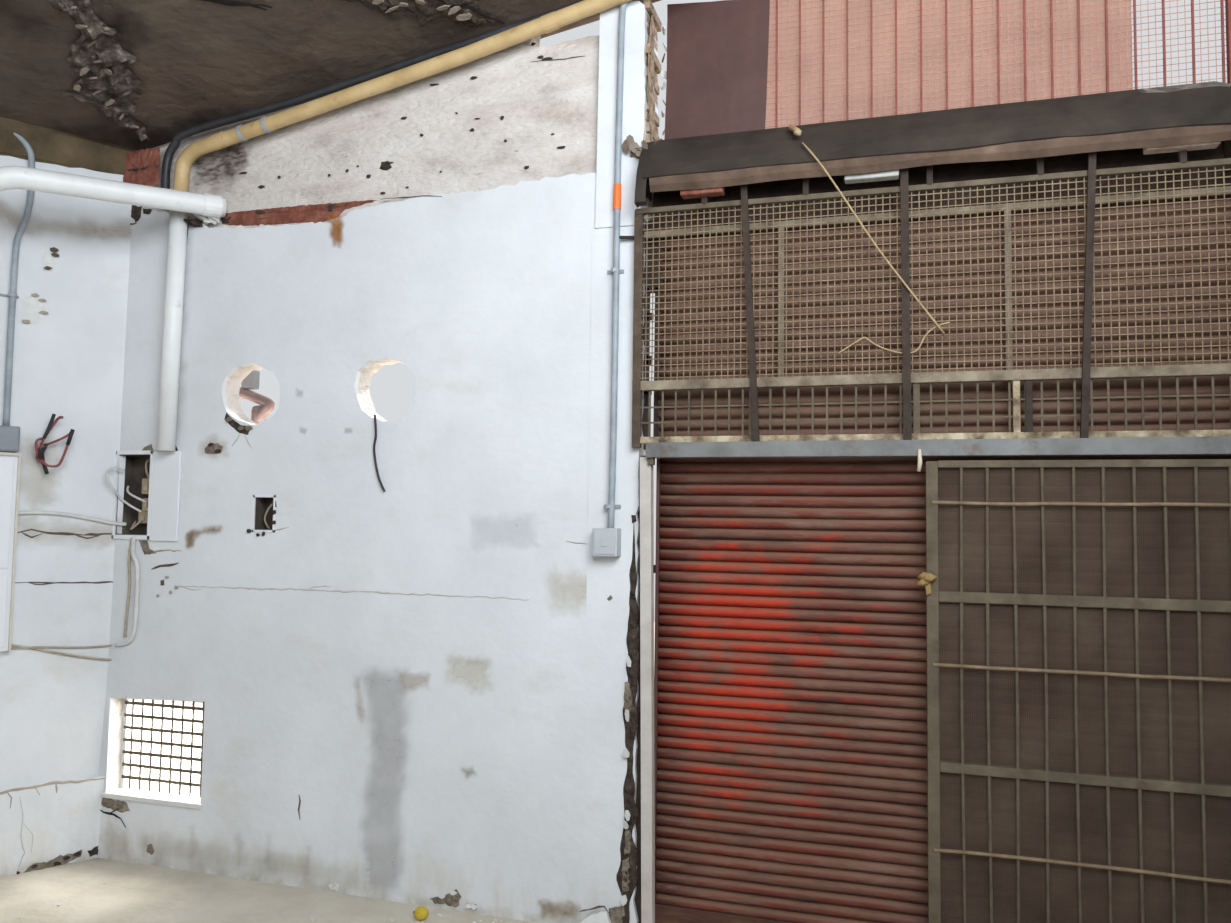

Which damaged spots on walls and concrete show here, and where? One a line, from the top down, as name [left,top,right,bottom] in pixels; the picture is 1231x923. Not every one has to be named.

flaking render [46,0,599,238]
flaking render [224,364,263,435]
flaking render [358,359,402,421]
flaking render [101,698,130,813]
spalling [579,515,640,923]